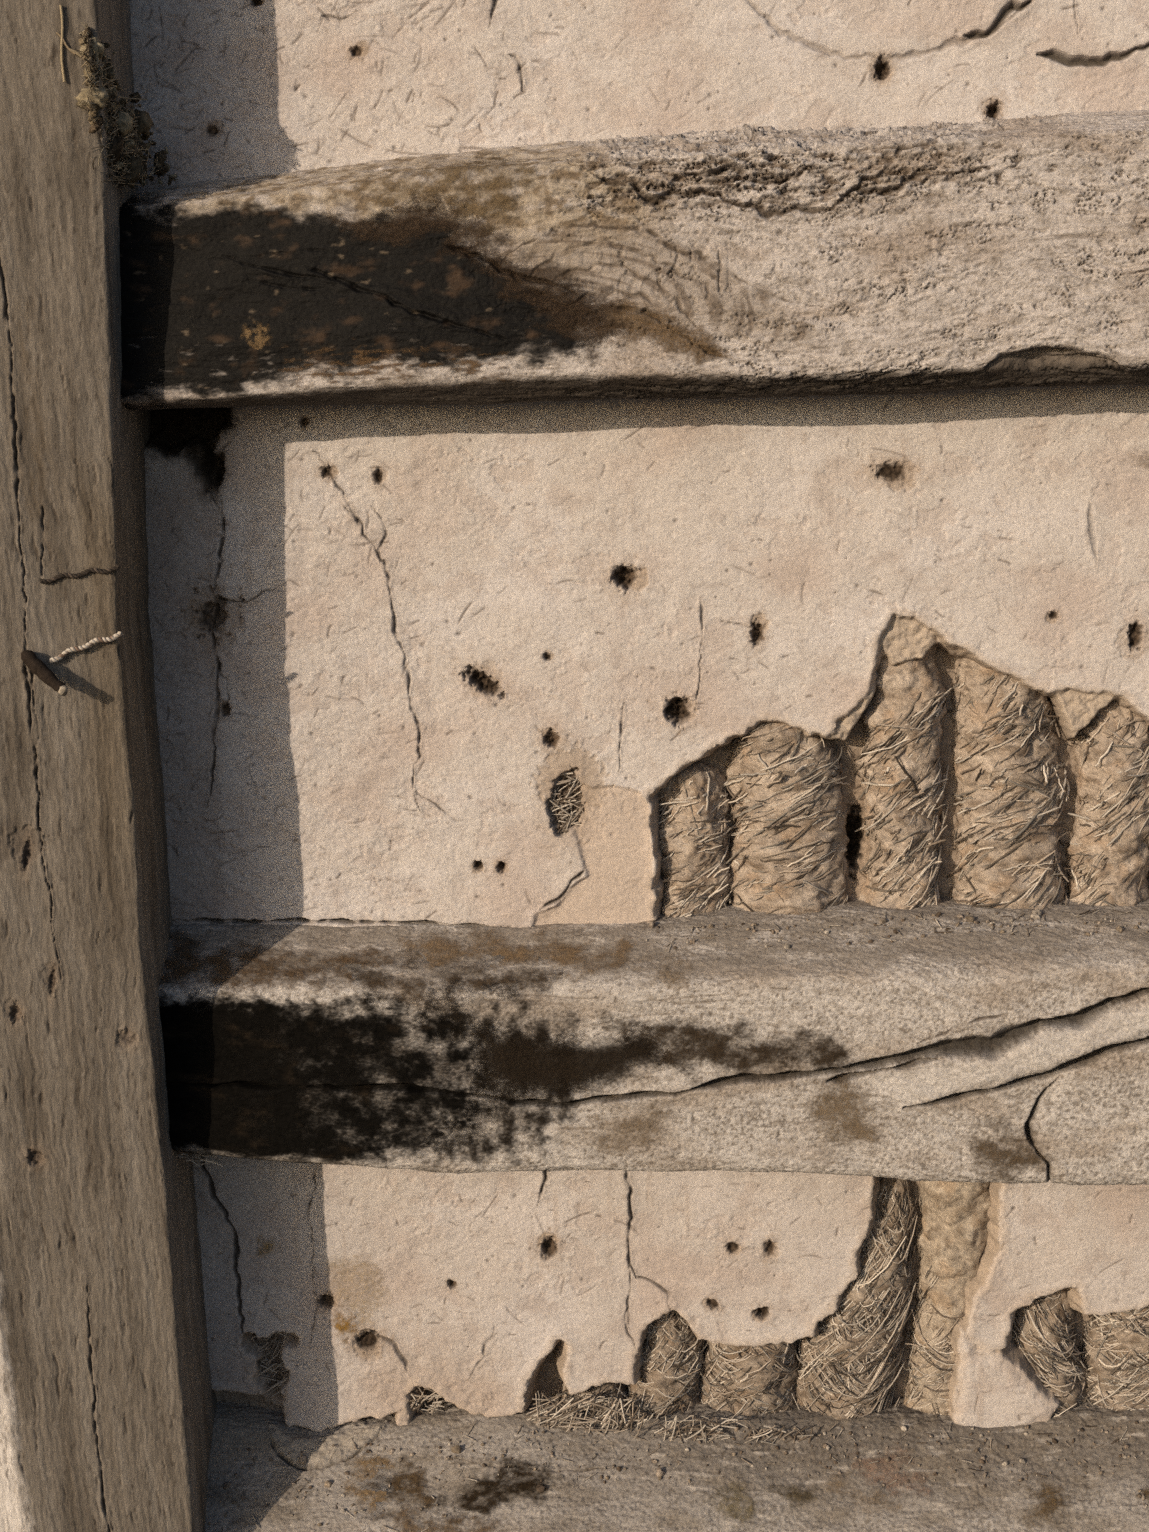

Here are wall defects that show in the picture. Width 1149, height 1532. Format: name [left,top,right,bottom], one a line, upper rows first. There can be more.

leakage [119,161,726,402]
crack [206,482,288,807]
crack [312,449,464,821]
spalling [527,613,1149,927]
crack [172,868,586,928]
leakage [159,931,875,1169]
crack [476,987,1149,1182]
spalling [213,1331,360,1432]
crack [199,1156,387,1493]
spalling [392,1176,880,1446]
spalling [894,1180,922,1397]
spalling [948,1182,1110,1428]